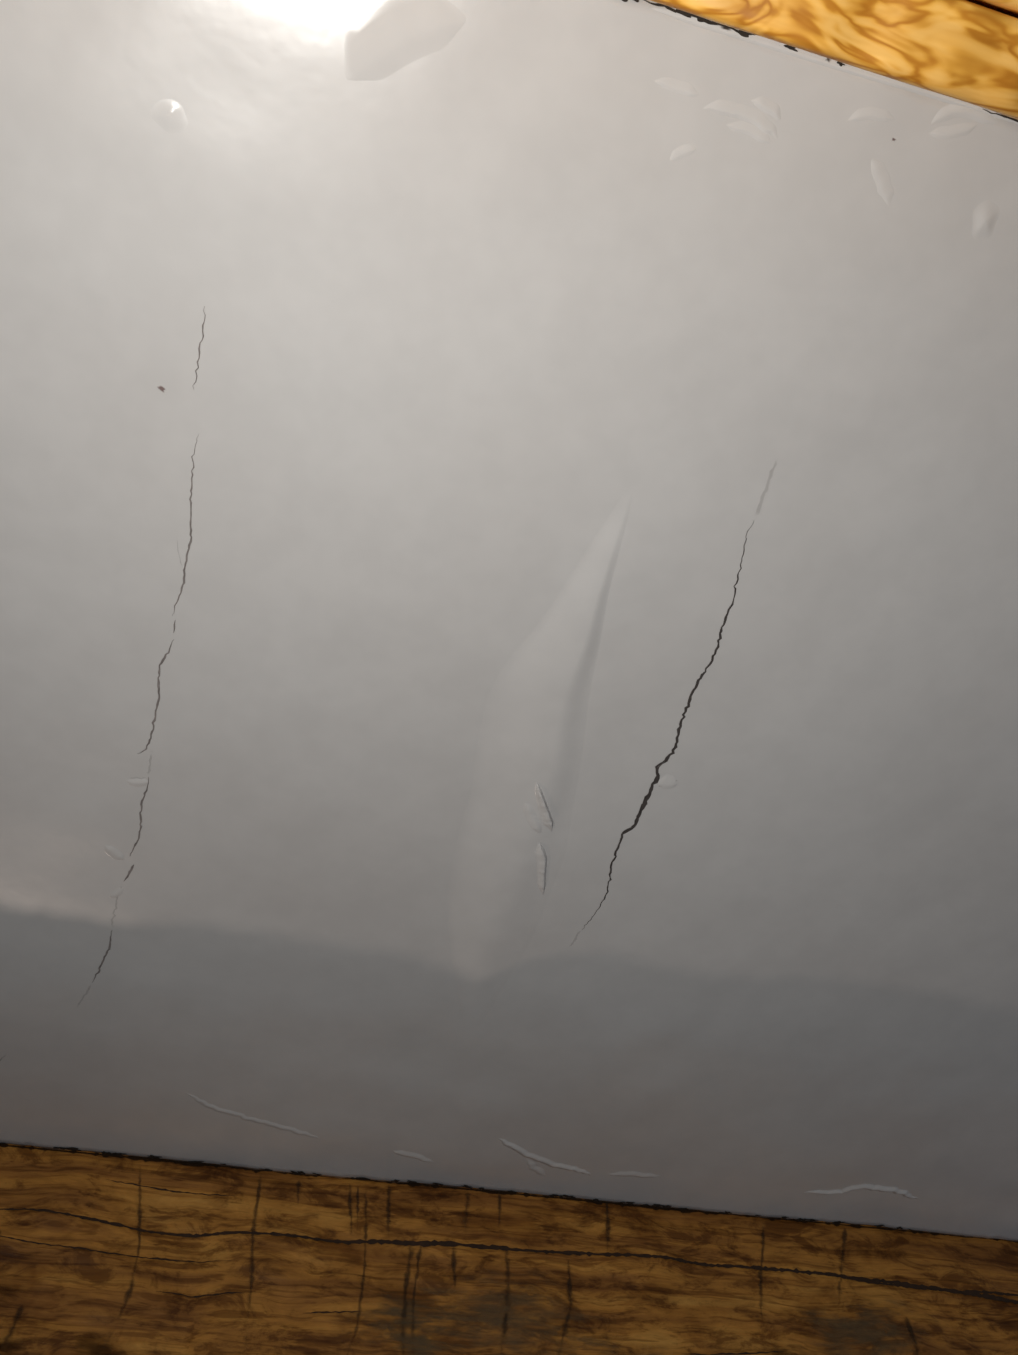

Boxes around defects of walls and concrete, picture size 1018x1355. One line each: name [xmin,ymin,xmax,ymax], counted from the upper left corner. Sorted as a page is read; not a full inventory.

crack [193,306,206,385]
crack [104,438,197,898]
crack [582,522,754,930]
crack [93,931,112,981]